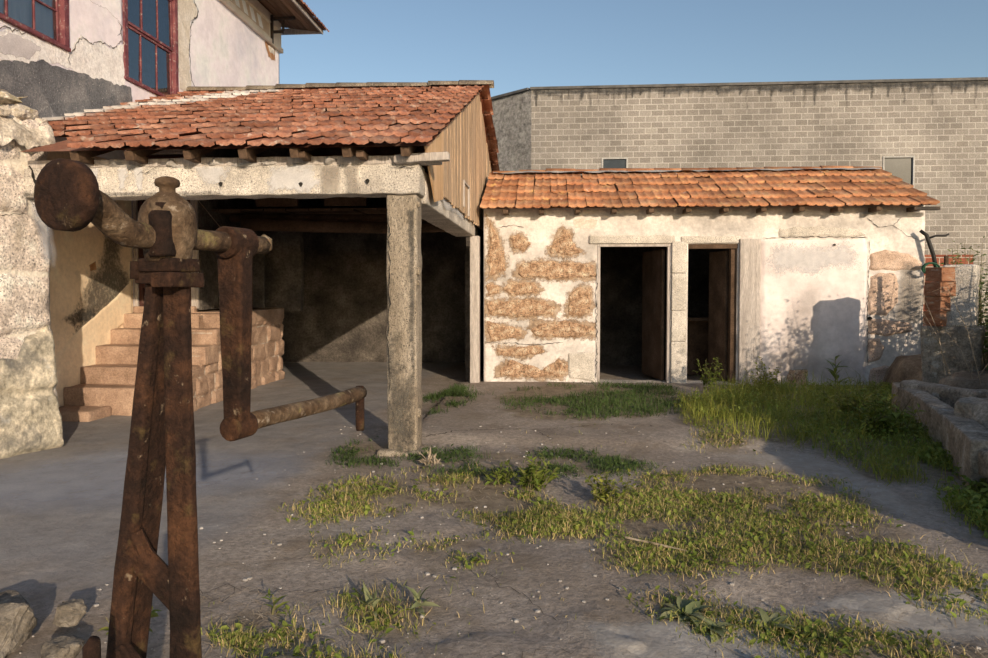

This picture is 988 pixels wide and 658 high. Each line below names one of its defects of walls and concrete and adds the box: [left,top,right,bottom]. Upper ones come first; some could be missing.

flaking render [0,25,132,118]
spalling [178,0,199,91]